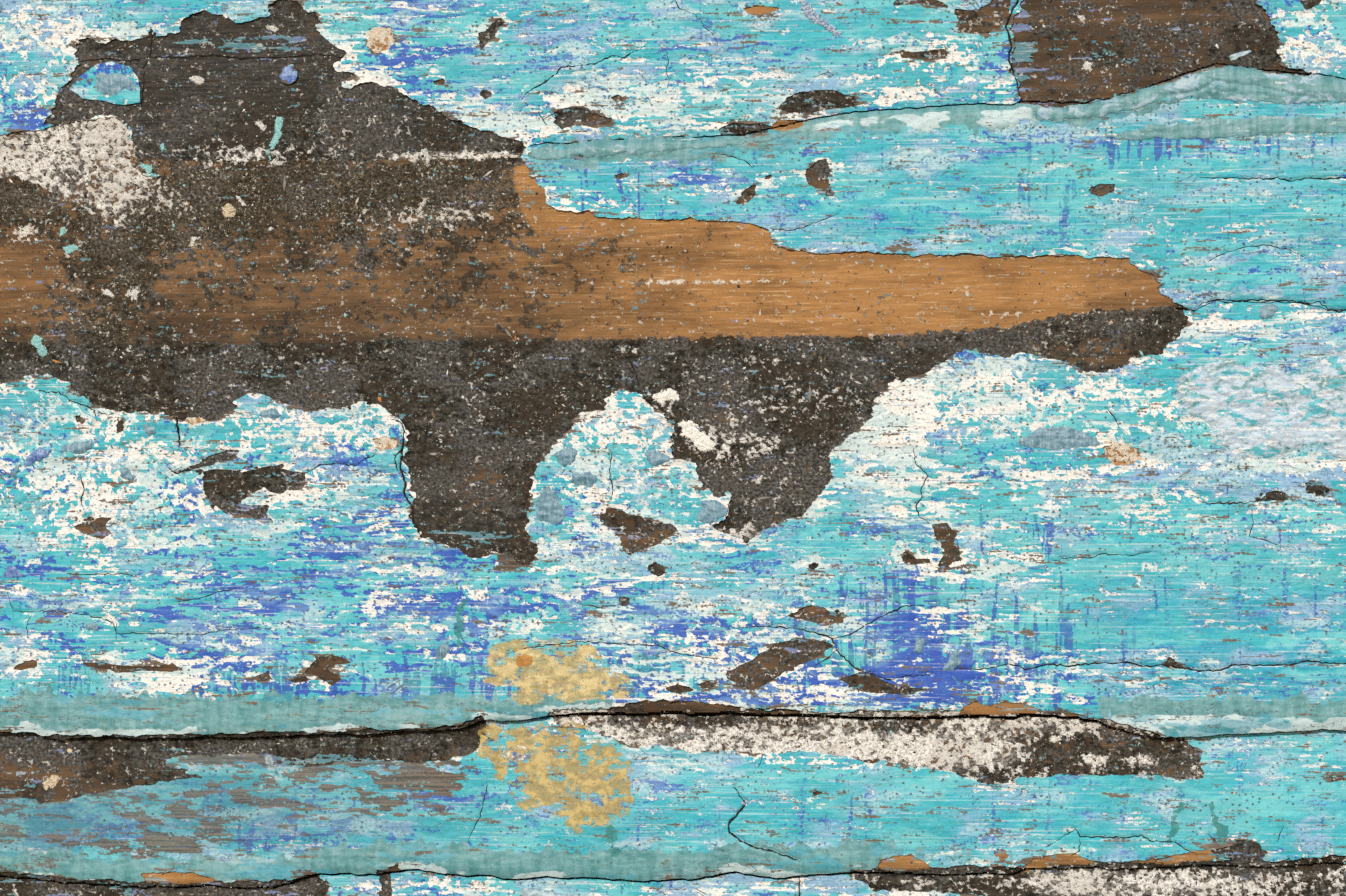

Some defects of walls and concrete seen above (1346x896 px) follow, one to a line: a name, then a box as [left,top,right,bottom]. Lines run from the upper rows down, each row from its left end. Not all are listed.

crack [1005,0,1022,102]
peeling [894,0,1317,108]
peeling [1300,0,1321,11]
peeling [0,0,1188,565]
peeling [600,507,677,577]
peeling [902,523,962,573]
peeling [548,605,1204,785]
peeling [0,715,488,803]
crack [728,754,800,896]
peeling [848,840,1346,896]